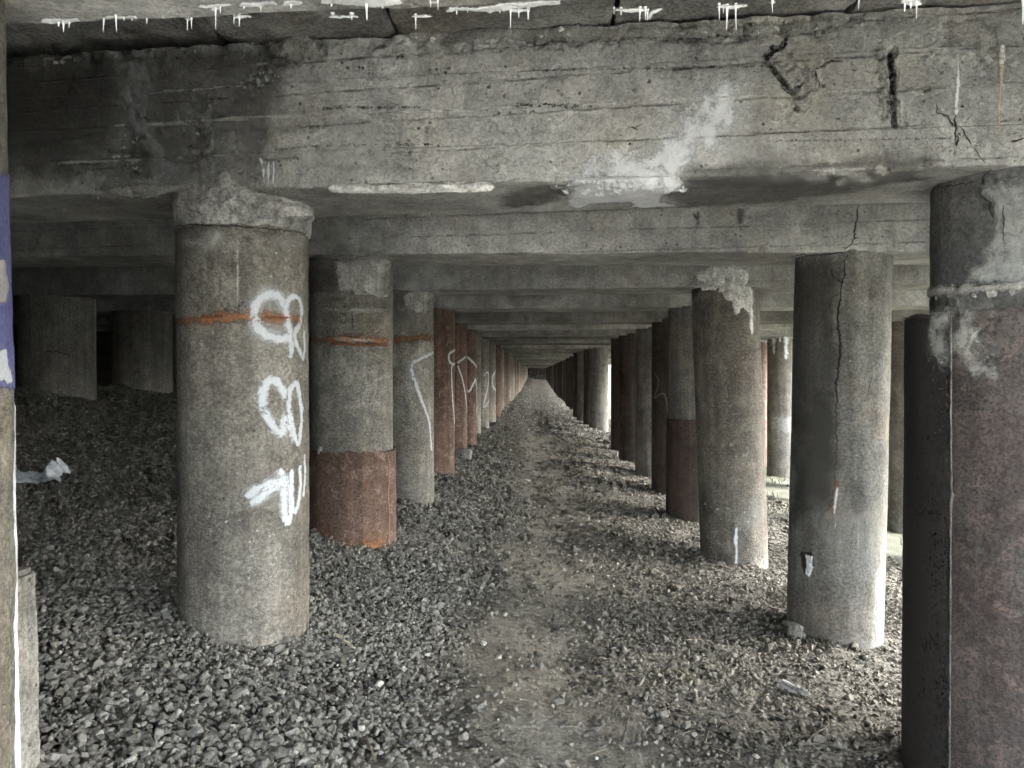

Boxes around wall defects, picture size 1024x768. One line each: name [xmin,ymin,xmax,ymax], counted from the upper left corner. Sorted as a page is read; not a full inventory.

efflorescence [40,18,81,32]
efflorescence [198,0,303,30]
efflorescence [321,0,403,20]
efflorescence [411,0,560,28]
efflorescence [612,6,662,22]
efflorescence [716,3,748,31]
efflorescence [901,0,922,18]
crack [763,38,841,113]
crack [874,50,901,128]
crack [936,53,1019,180]
leakage [505,79,924,220]
crack [790,204,872,257]